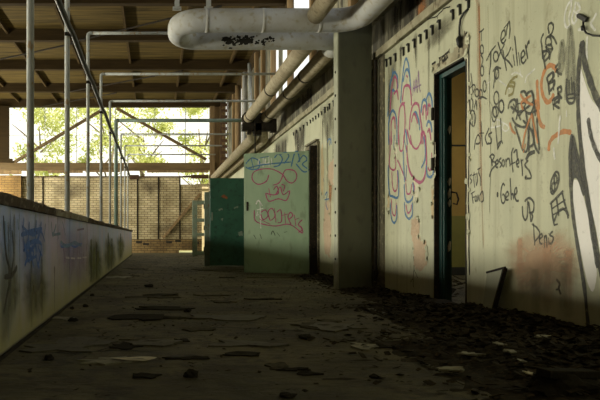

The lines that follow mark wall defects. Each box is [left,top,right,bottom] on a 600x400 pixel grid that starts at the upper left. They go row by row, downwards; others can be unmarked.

peeling [221,35,275,49]